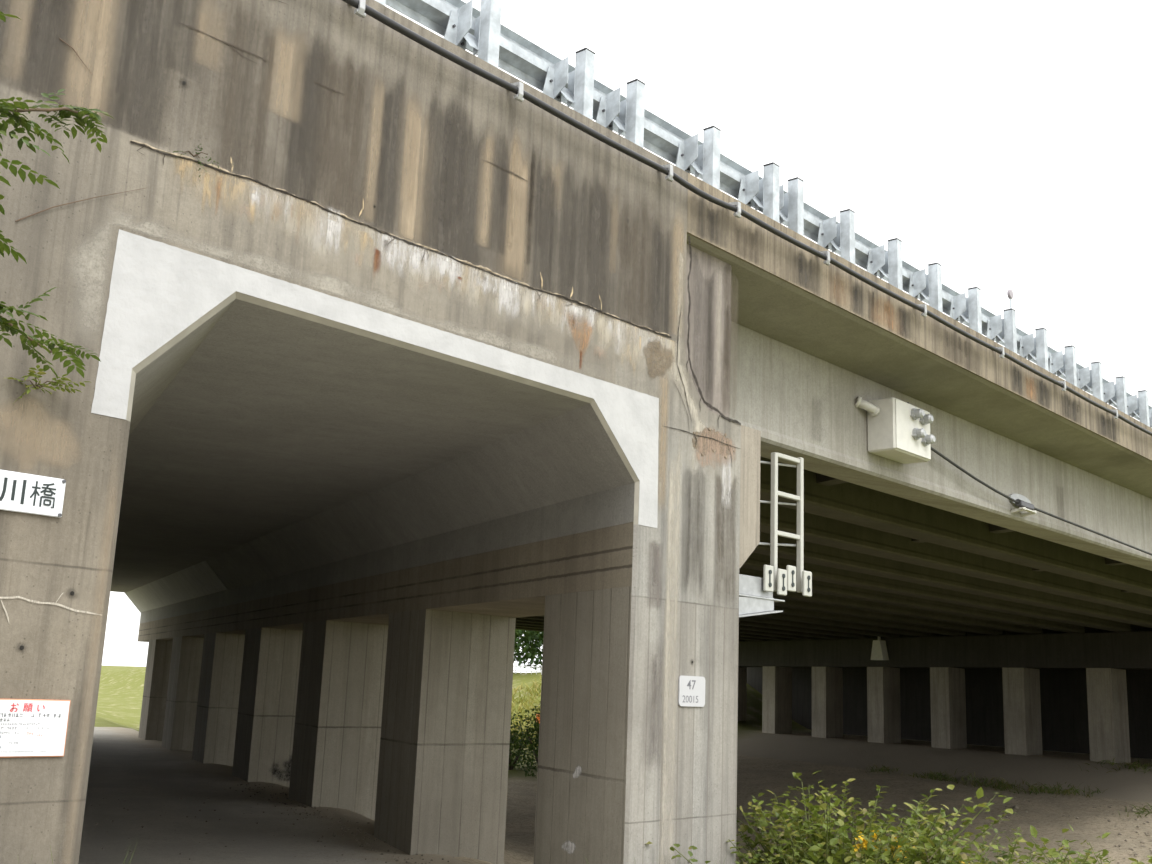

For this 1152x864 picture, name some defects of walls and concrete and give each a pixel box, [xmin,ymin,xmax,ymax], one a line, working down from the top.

water stain [179,159,259,216]
crack [130,140,741,461]
water stain [707,270,736,403]
water stain [853,285,874,318]
water stain [273,42,706,864]
spalling [692,428,735,466]
water stain [717,456,731,531]
crack [0,592,101,622]